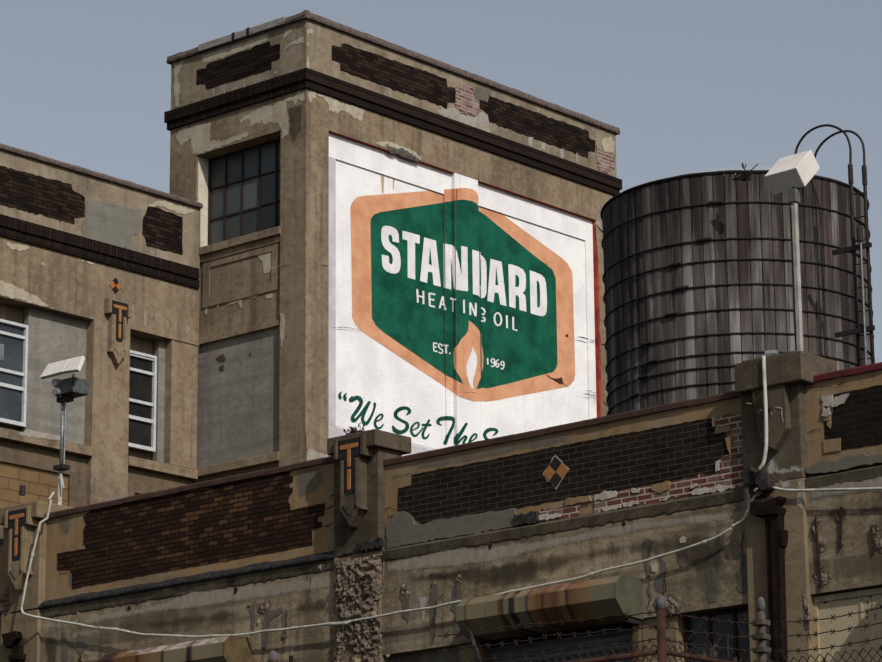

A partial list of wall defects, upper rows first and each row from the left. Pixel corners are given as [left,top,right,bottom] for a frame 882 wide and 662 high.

flaking render [455,85,481,117]
flaking render [596,137,615,176]
peeling [821,393,850,453]
flaking render [538,413,744,521]